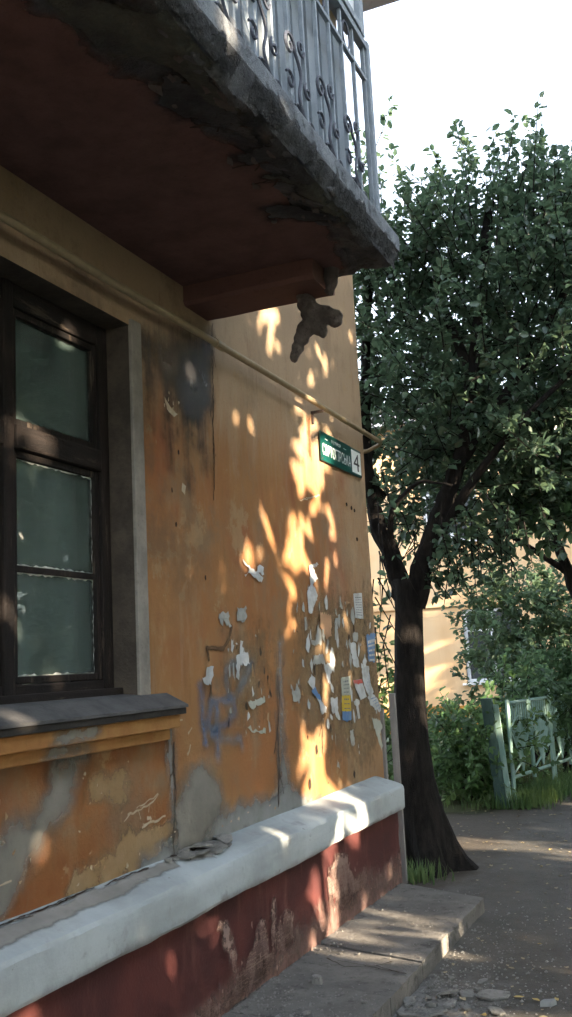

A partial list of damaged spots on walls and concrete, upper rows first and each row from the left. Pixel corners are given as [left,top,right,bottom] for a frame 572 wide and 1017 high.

spalling [248,76,324,179]
spalling [327,167,398,269]
water stain [141,332,210,424]
spalling [290,293,343,363]
peeling [228,629,272,734]
peeling [293,599,377,778]
crack [0,867,149,926]
peeling [0,755,313,948]
peeling [202,851,403,1017]